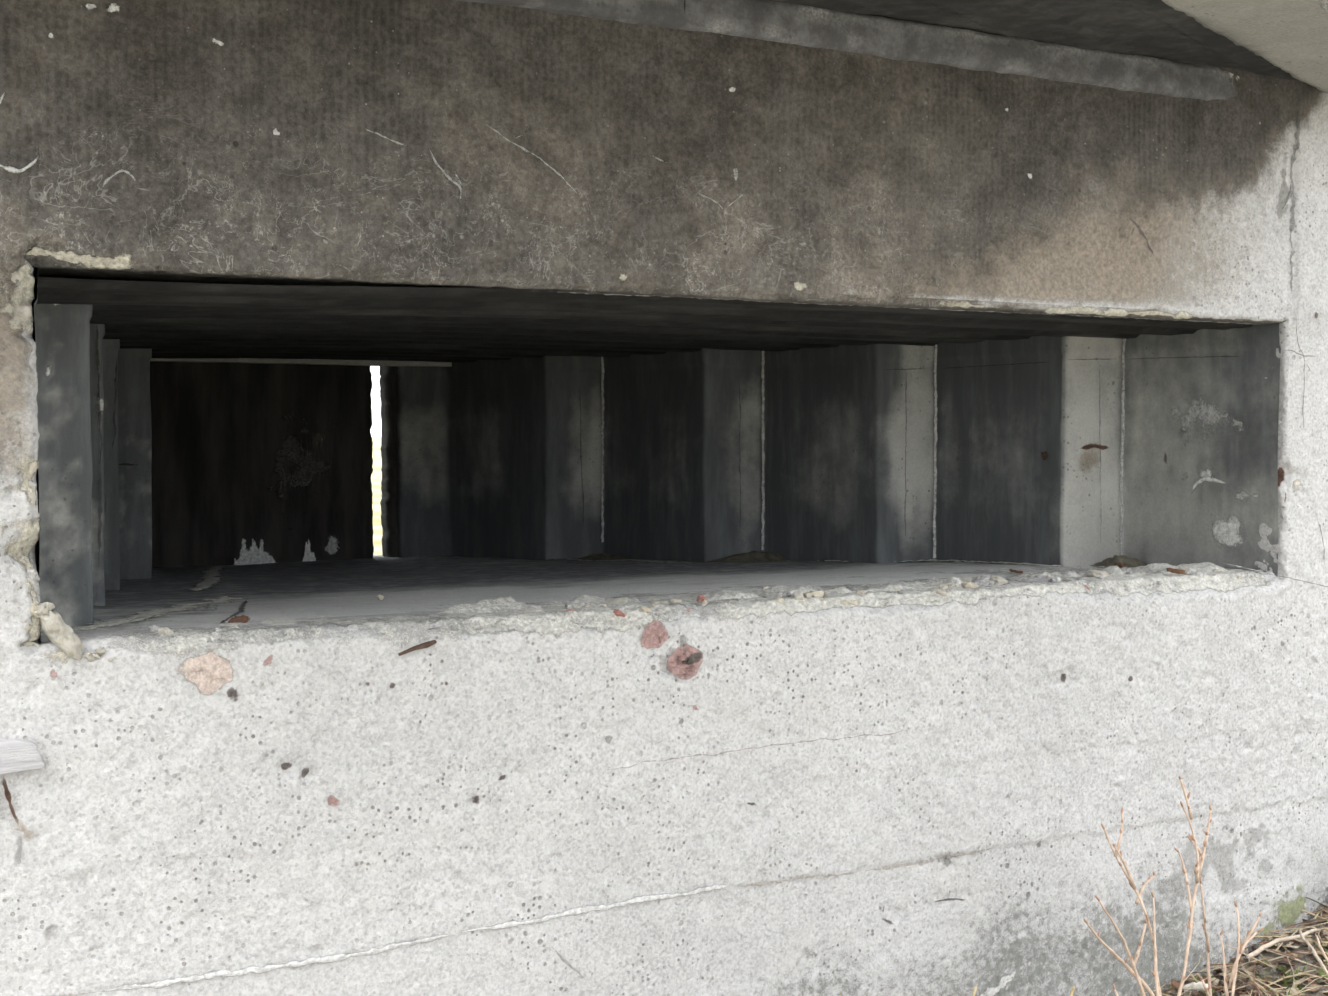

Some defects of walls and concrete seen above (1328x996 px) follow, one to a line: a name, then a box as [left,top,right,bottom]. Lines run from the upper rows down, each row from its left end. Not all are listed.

spalling [0,247,131,333]
spalling [3,455,67,677]
crack [556,951,583,977]